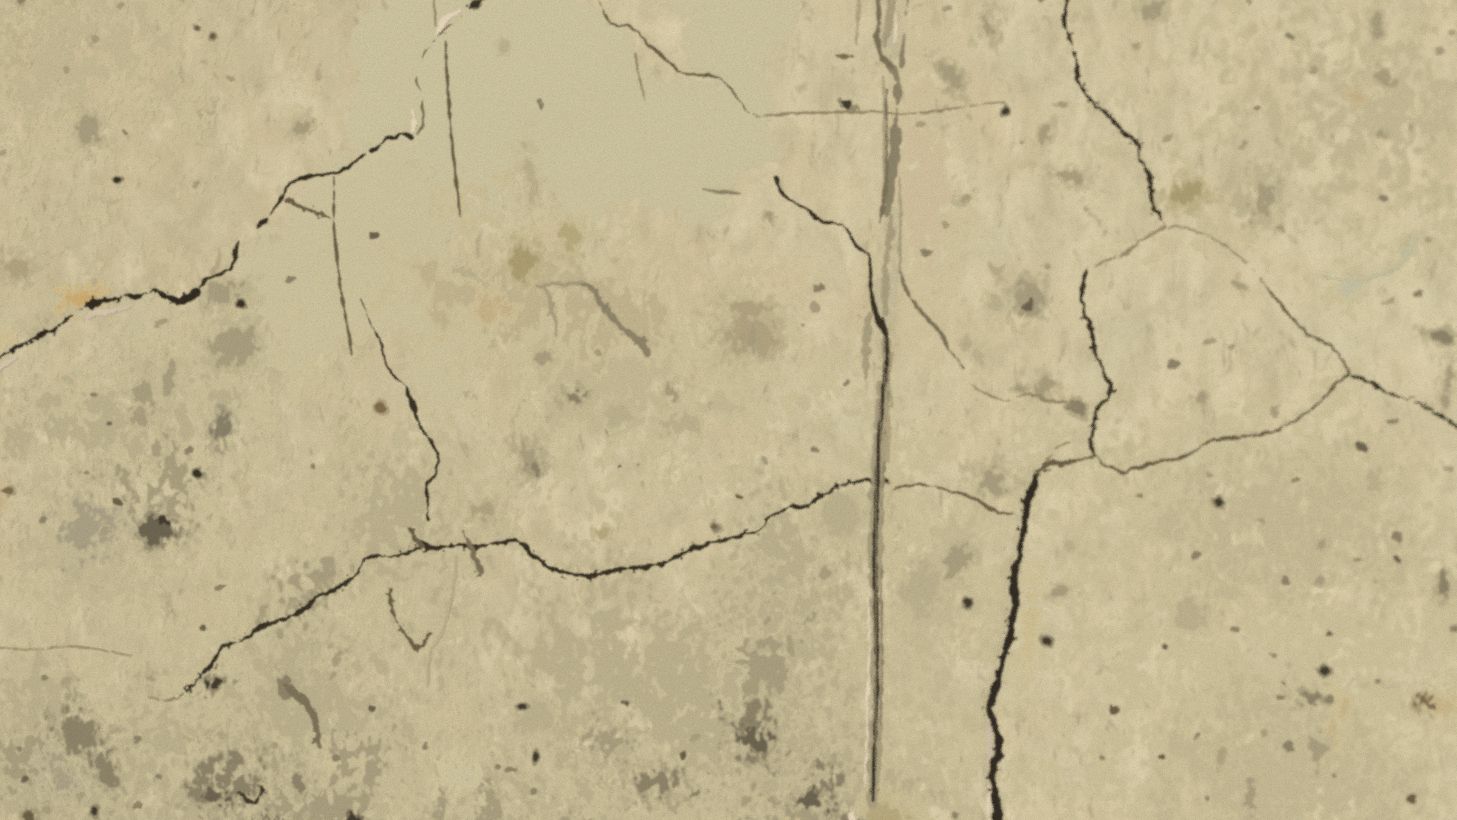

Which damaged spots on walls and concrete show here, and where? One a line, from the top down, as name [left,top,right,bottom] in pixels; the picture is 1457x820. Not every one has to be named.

crack [599,1,1005,117]
crack [0,0,482,358]
crack [774,176,868,255]
crack [535,280,651,357]
crack [360,298,440,521]
crack [885,0,1457,820]
crack [148,477,872,702]
crack [0,645,132,656]
crack [283,683,321,749]
crack [237,785,267,805]